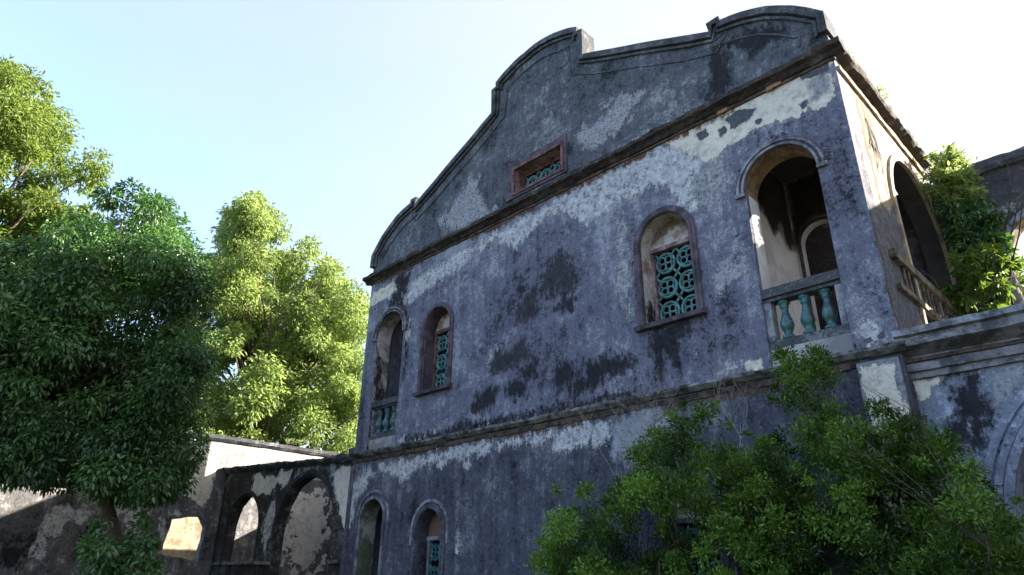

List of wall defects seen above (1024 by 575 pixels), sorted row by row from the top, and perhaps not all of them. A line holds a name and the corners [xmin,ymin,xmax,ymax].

peeling [370,61,836,352]
water stain [404,248,690,442]
peeling [858,362,943,443]
water stain [939,371,999,456]
peeling [27,500,92,563]
peeling [251,415,613,575]